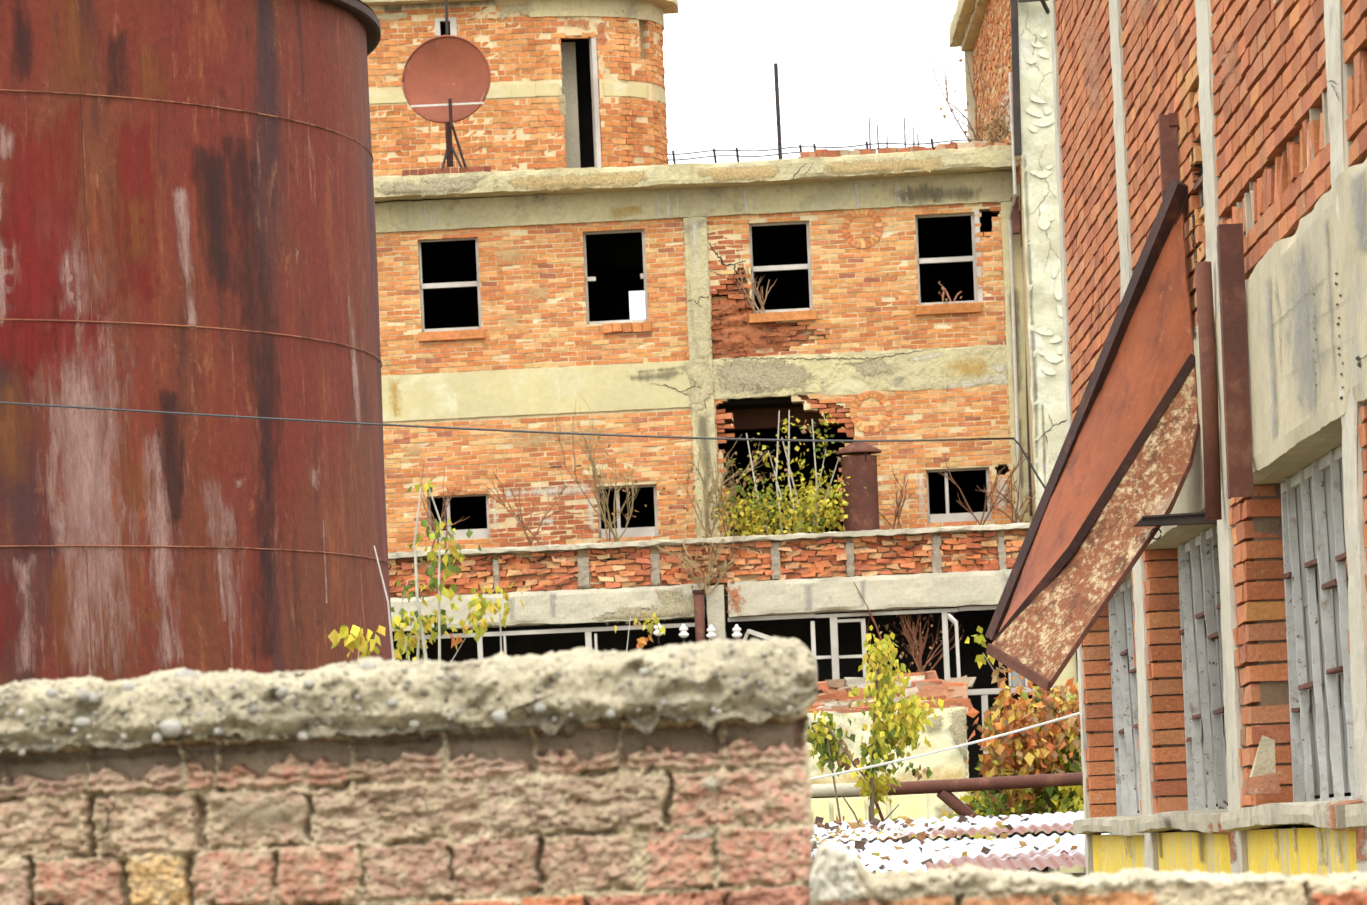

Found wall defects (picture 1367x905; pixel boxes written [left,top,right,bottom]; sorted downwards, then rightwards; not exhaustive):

spalling [1347,51,1367,115]
spalling [1218,92,1330,239]